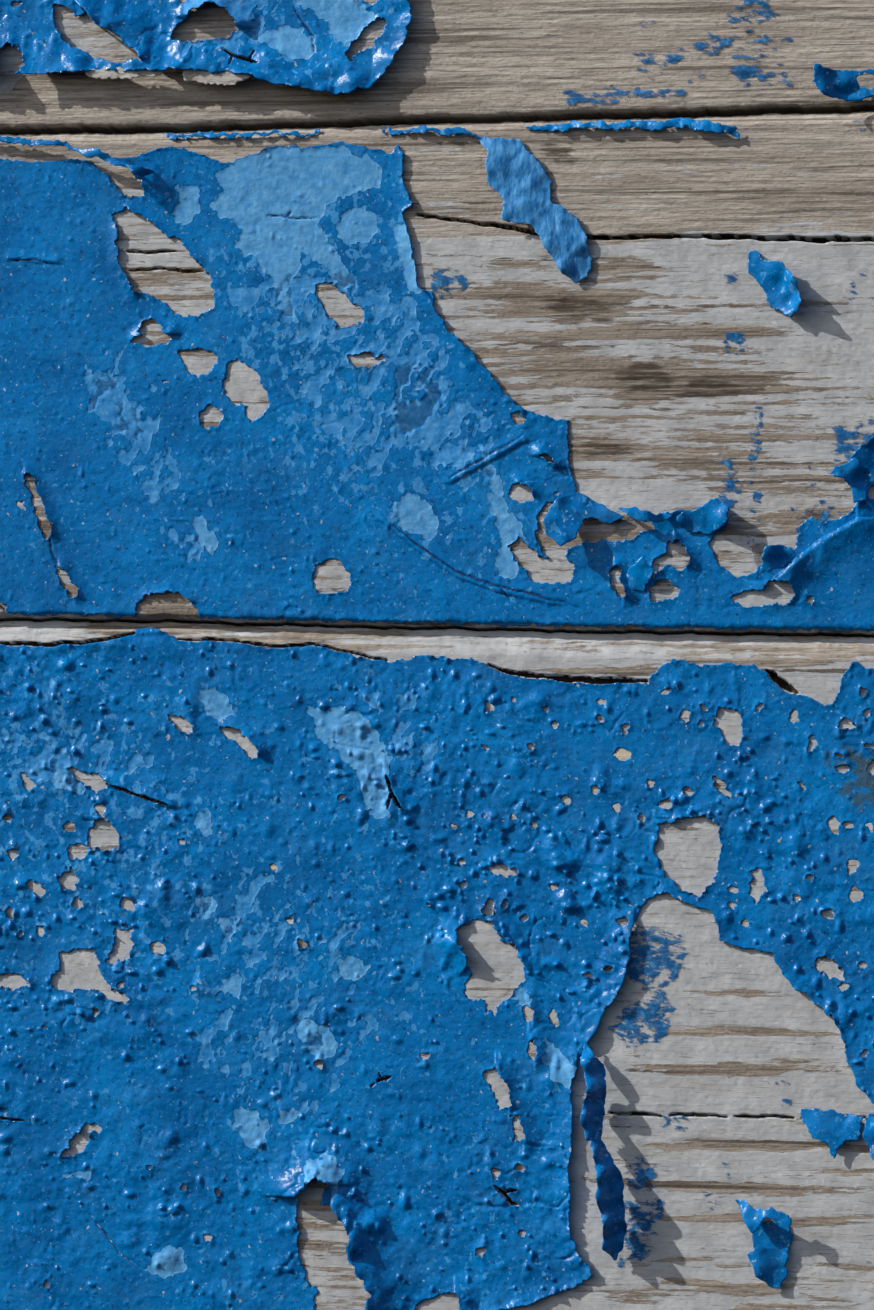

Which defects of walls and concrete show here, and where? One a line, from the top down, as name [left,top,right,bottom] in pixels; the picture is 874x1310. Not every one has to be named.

peeling [0,43,25,94]
peeling [52,4,164,80]
peeling [0,118,874,608]
crack [393,524,555,601]
peeling [178,808,213,845]
peeling [120,897,135,912]
peeling [51,928,166,1016]
peeling [184,864,379,1152]
peeling [455,787,874,1310]
peeling [60,1123,102,1183]
peeling [144,1245,187,1279]
peeling [416,1292,459,1310]